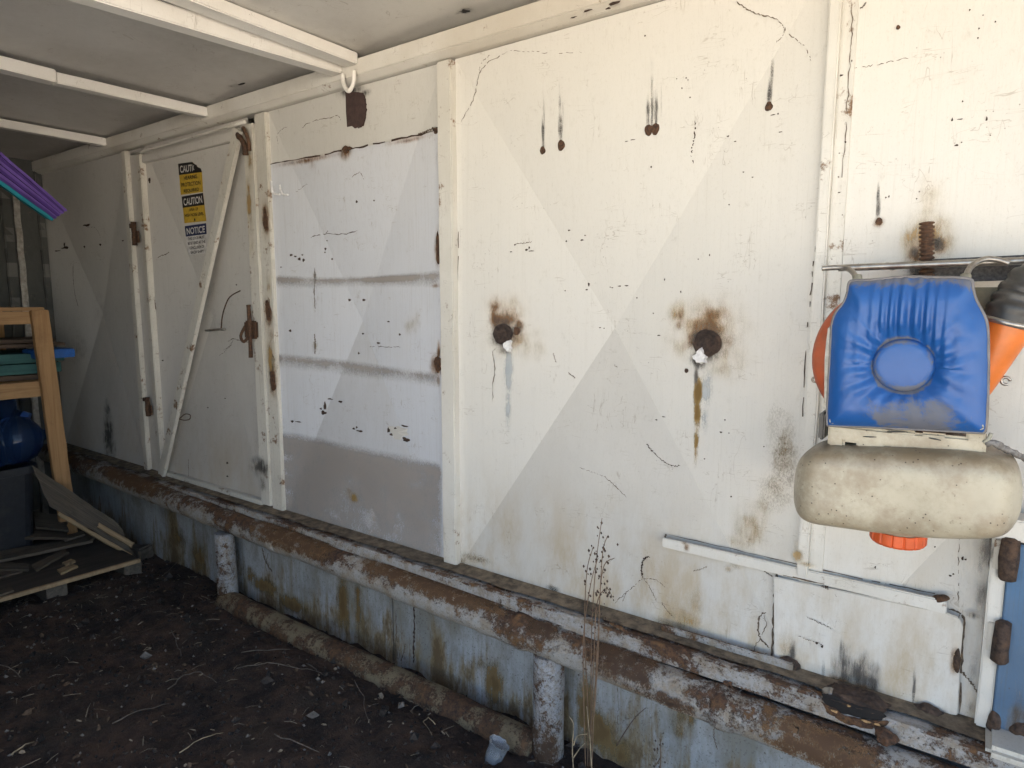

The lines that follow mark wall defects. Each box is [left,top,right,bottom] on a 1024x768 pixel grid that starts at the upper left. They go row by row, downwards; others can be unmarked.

crack [737,2,811,61]
crack [270,50,582,192]
rust [491,304,522,413]
rust [684,310,722,456]
rust [360,558,513,617]
crack [615,534,977,714]
rust [932,594,950,603]
rust [780,646,801,671]
rust [952,648,961,673]
rust [576,641,695,764]
rust [759,702,889,768]
rust [913,702,944,717]